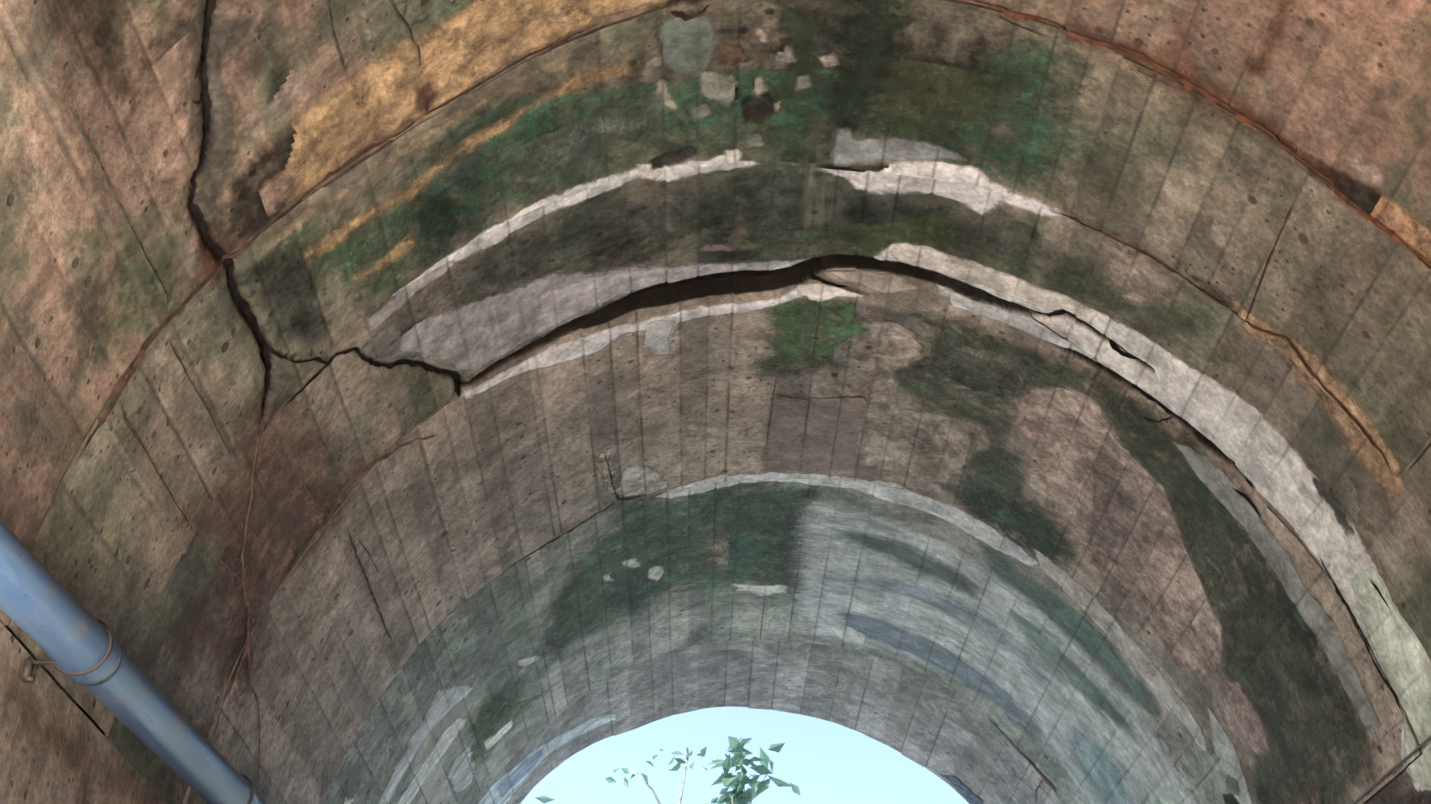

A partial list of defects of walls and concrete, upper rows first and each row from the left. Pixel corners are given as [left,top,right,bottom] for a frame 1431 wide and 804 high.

corrosion [259,0,671,257]
damp [782,9,823,101]
corrosion [1067,19,1431,270]
crack [68,0,605,783]
corrosion [354,236,413,280]
peeling [534,259,802,335]
crack [643,255,908,290]
peeling [863,321,990,485]
crack [965,283,1213,443]
peeling [1103,237,1171,303]
corrosion [1202,291,1405,498]
crack [503,455,645,573]